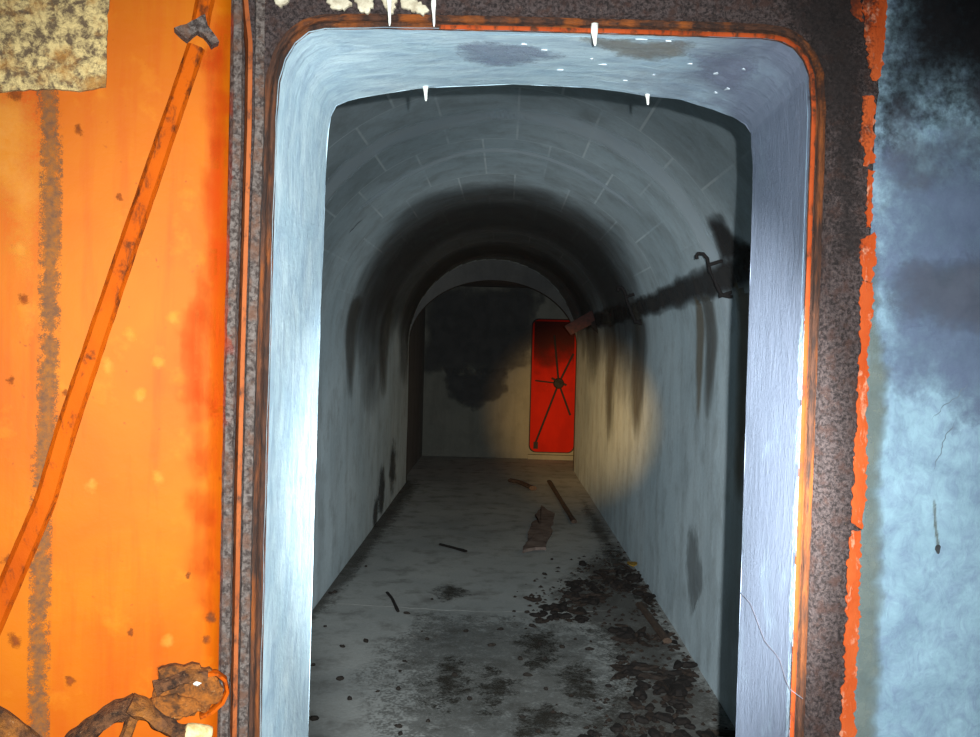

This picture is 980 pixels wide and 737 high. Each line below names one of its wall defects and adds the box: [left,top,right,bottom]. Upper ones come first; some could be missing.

damp [326,0,429,16]
peeling [851,0,888,81]
rust [31,90,67,505]
damp [424,288,544,407]
damp [604,311,615,421]
damp [633,309,645,422]
peeling [839,95,877,737]
damp [373,448,396,526]
rust [12,519,53,737]
damp [433,586,467,602]
damp [420,657,516,715]
damp [516,704,571,737]